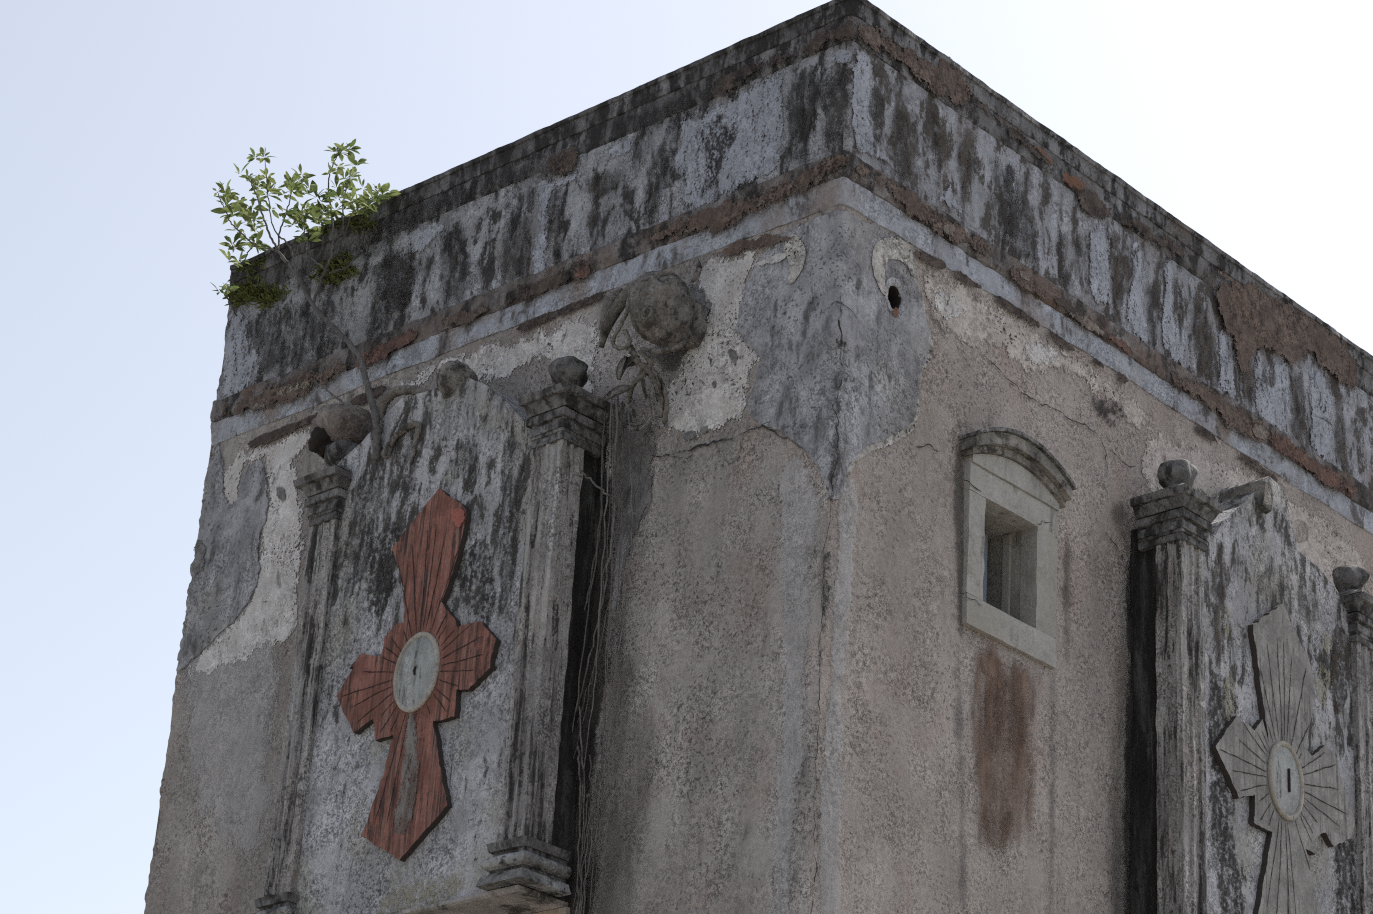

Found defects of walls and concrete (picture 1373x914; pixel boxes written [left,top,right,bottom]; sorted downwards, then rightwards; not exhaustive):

leakage [243,154,574,378]
leakage [705,115,737,203]
flaking render [650,49,893,441]
leakage [869,86,1040,273]
peeling [1077,189,1111,305]
peeling [219,310,417,420]
flaking render [872,237,1367,593]
flaking render [185,412,318,851]
leakage [346,469,399,617]
leakage [455,439,525,622]
peeling [394,712,419,834]
leakage [1207,543,1245,914]